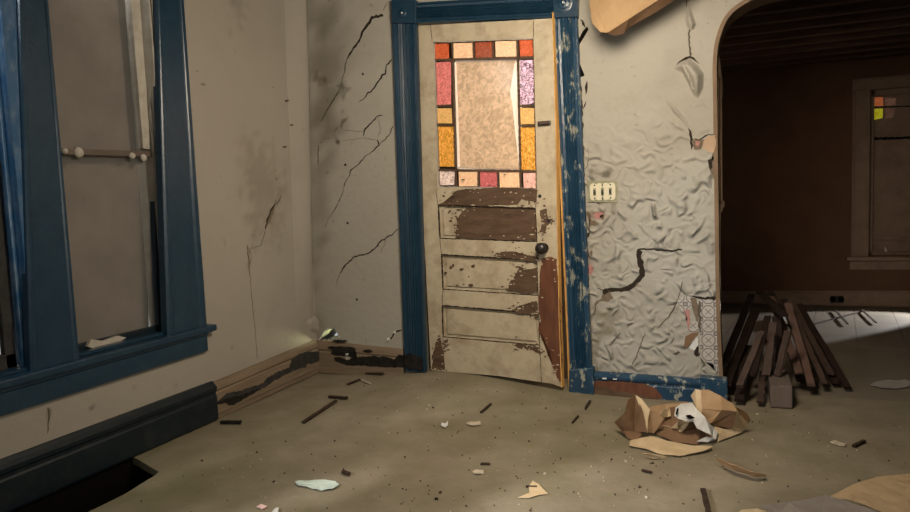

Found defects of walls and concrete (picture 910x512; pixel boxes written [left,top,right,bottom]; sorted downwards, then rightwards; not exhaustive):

crack [317,2,394,228]
flaking render [692,135,716,179]
crack [247,196,281,359]
crack [336,229,398,284]
peeling [438,179,567,382]
crack [596,239,682,292]